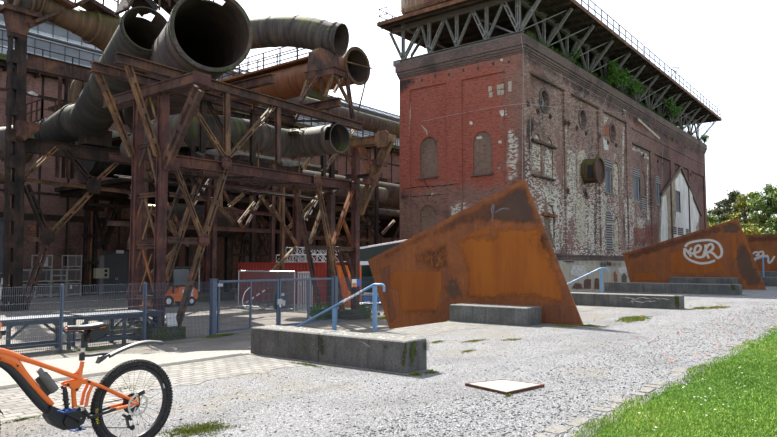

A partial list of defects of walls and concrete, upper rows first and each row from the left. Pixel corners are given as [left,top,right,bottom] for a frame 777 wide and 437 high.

peeling [499,130,518,180]
peeling [532,116,650,253]
corrosion [446,189,580,323]
flaking render [607,261,627,282]
corrosion [629,223,777,285]